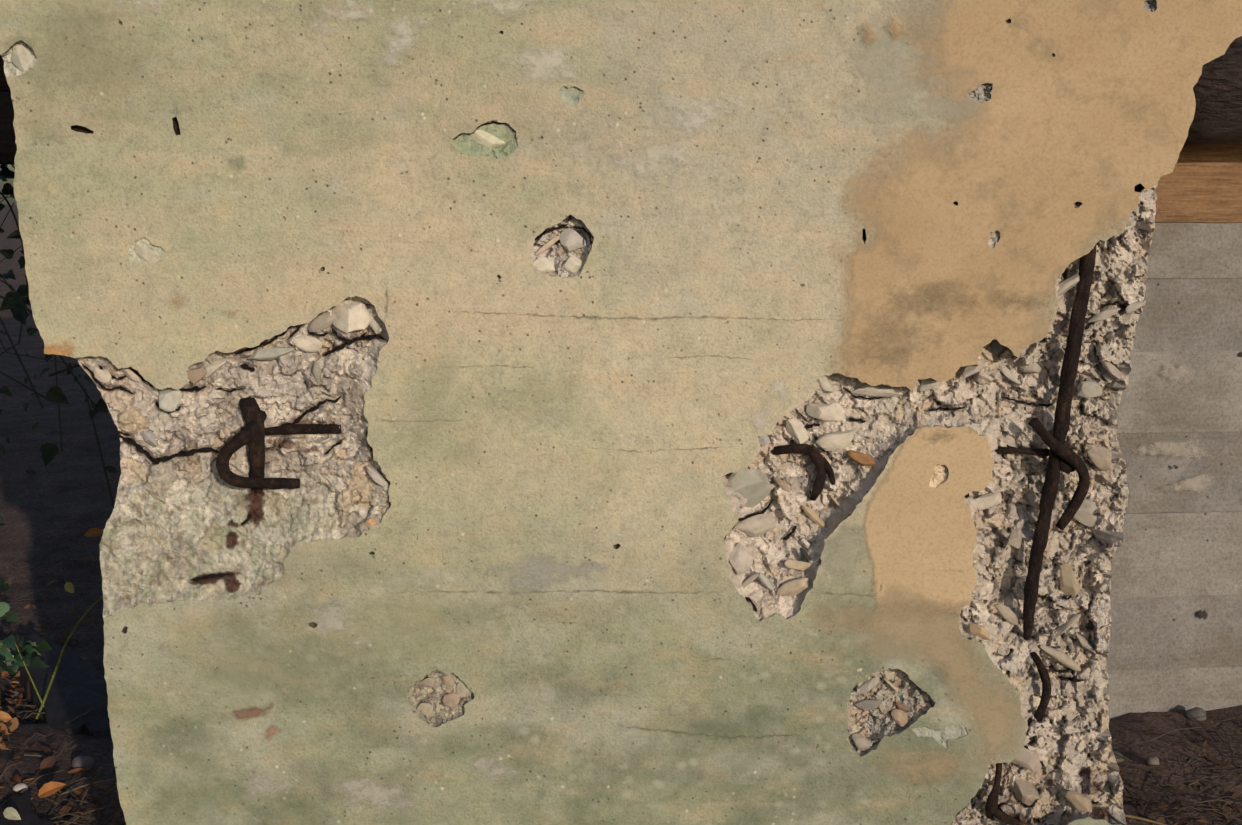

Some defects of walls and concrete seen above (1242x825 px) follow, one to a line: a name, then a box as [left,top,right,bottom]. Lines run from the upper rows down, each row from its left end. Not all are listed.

peeling [453,120,518,160]
spalling [530,214,594,278]
damp [842,0,1242,390]
spalling [76,296,391,618]
spalling [407,670,474,727]
spalling [723,182,1158,825]
damp [862,426,1021,758]